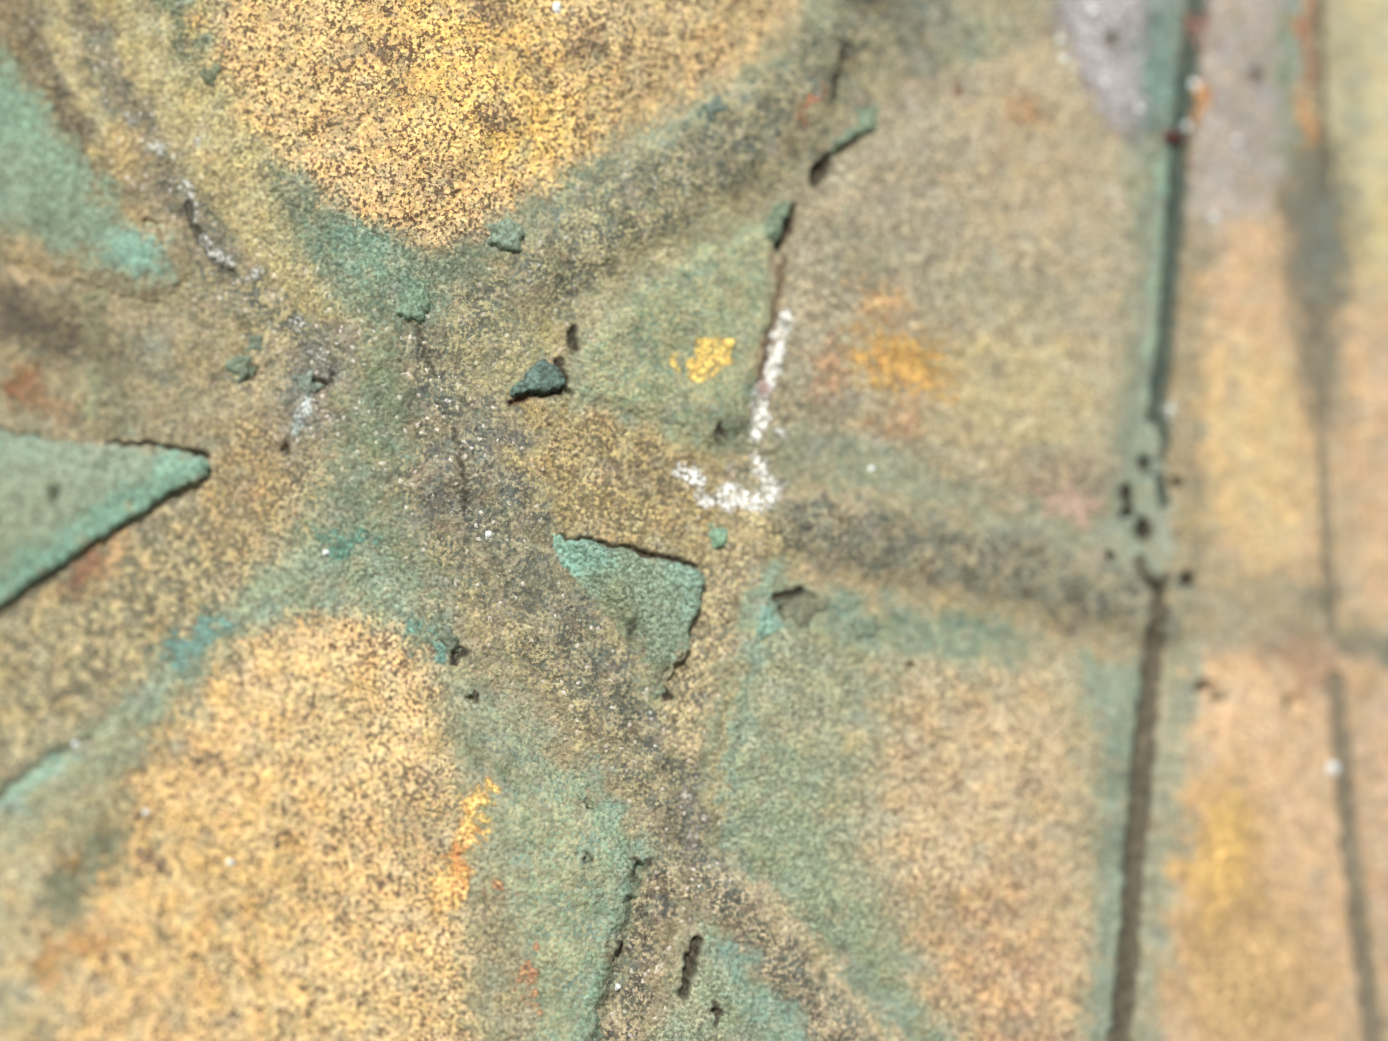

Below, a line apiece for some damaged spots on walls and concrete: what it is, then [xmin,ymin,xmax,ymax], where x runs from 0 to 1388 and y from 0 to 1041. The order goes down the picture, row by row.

crack [1105,0,1208,1041]